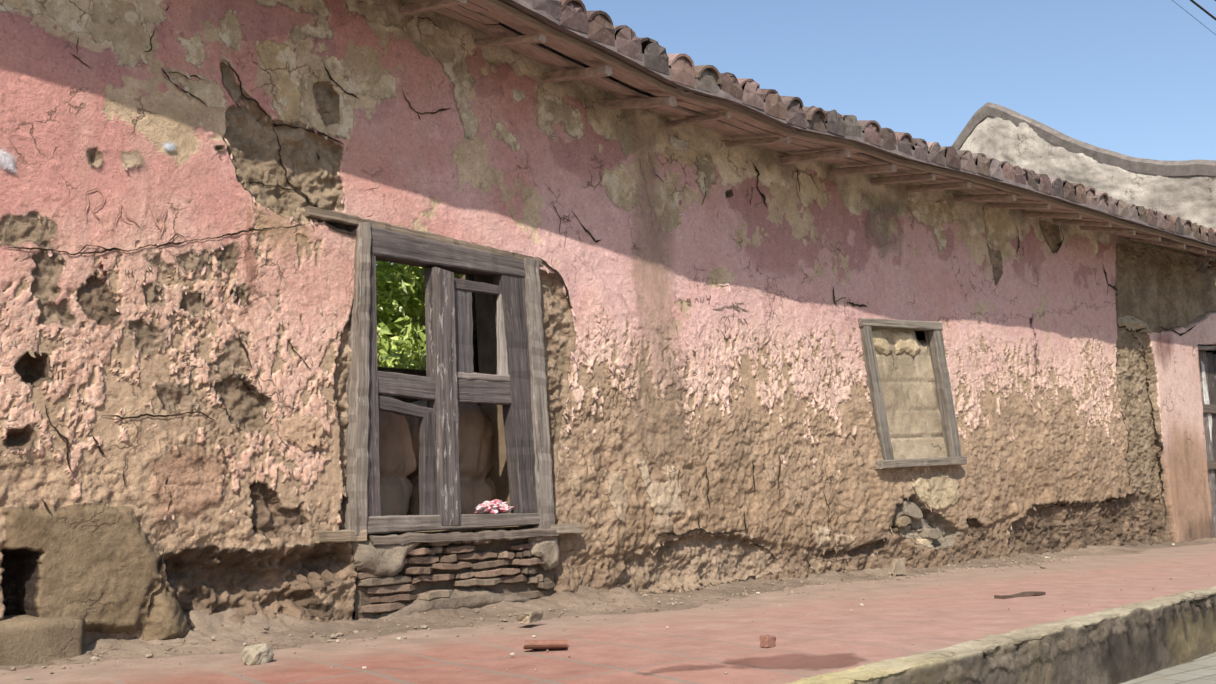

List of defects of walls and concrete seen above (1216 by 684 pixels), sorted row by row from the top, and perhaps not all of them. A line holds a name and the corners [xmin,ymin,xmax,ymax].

peeling [345,0,414,31]
peeling [163,32,228,111]
peeling [218,0,397,141]
crack [402,89,450,120]
peeling [600,164,641,211]
peeling [694,153,734,199]
crack [8,224,305,255]
crack [553,205,602,243]
crack [833,287,868,307]
peeling [0,212,356,540]
crack [45,406,216,484]
crack [1017,498,1124,530]